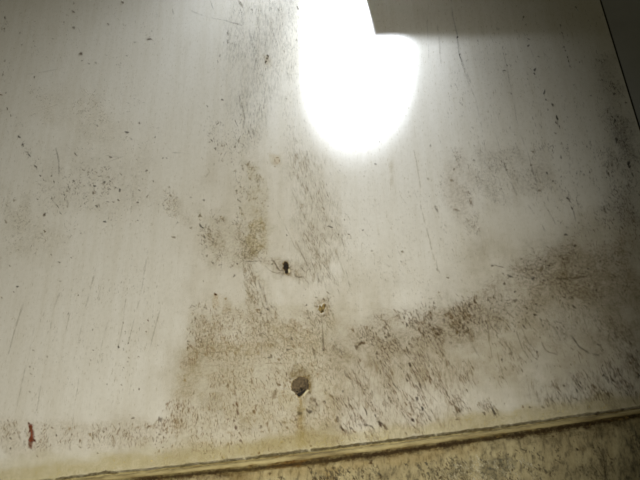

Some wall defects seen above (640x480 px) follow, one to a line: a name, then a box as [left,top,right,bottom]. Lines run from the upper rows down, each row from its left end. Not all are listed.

spalling [291,376,309,397]
damp [221,413,592,462]